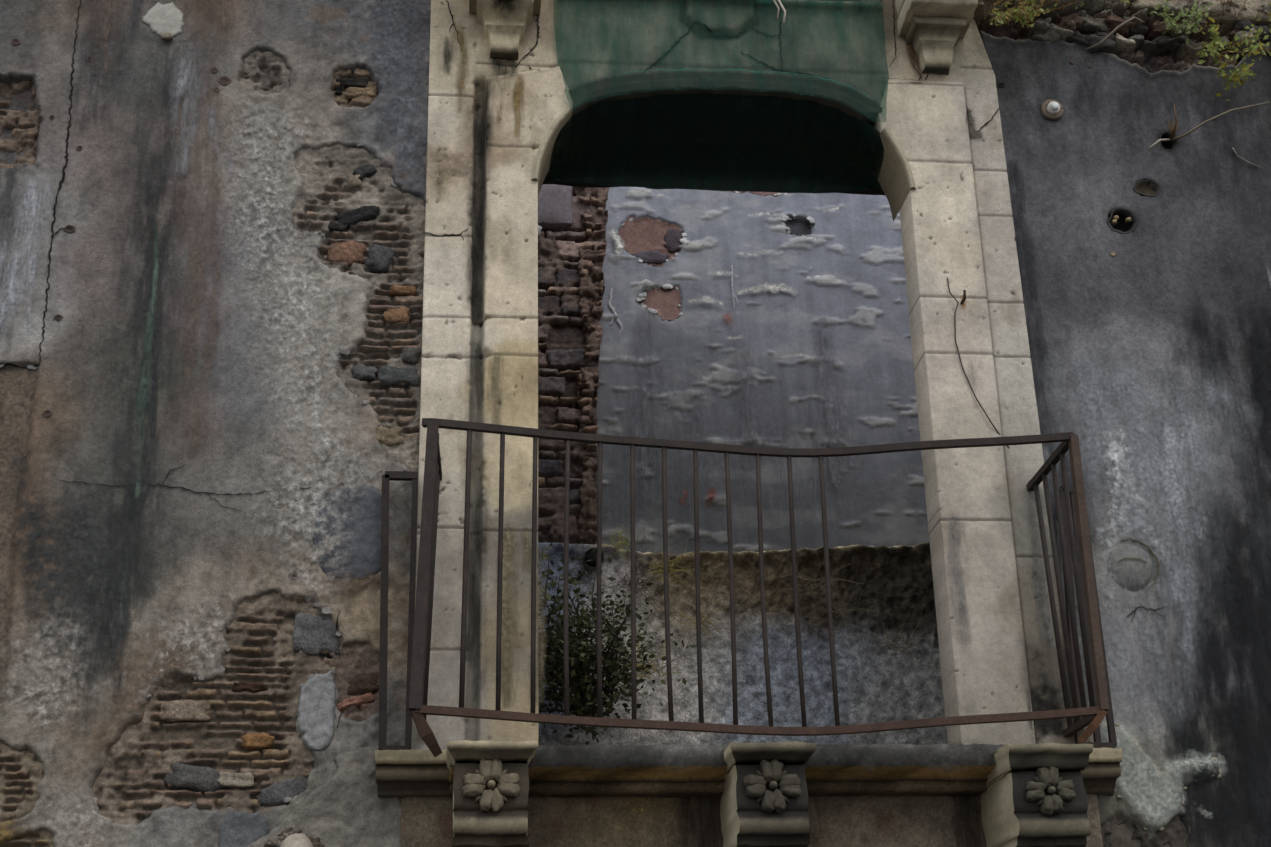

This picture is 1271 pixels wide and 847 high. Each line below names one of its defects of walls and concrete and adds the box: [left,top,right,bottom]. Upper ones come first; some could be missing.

spalling [0,742,44,822]
crack [0,0,81,368]
damp [7,146,188,725]
damp [144,590,230,696]
crack [61,463,383,510]
spalling [91,592,379,825]
spalling [291,143,426,476]
damp [368,0,516,320]
spalling [573,186,723,542]
flaking render [748,211,816,241]
damp [1010,163,1051,395]
damp [1078,320,1271,847]